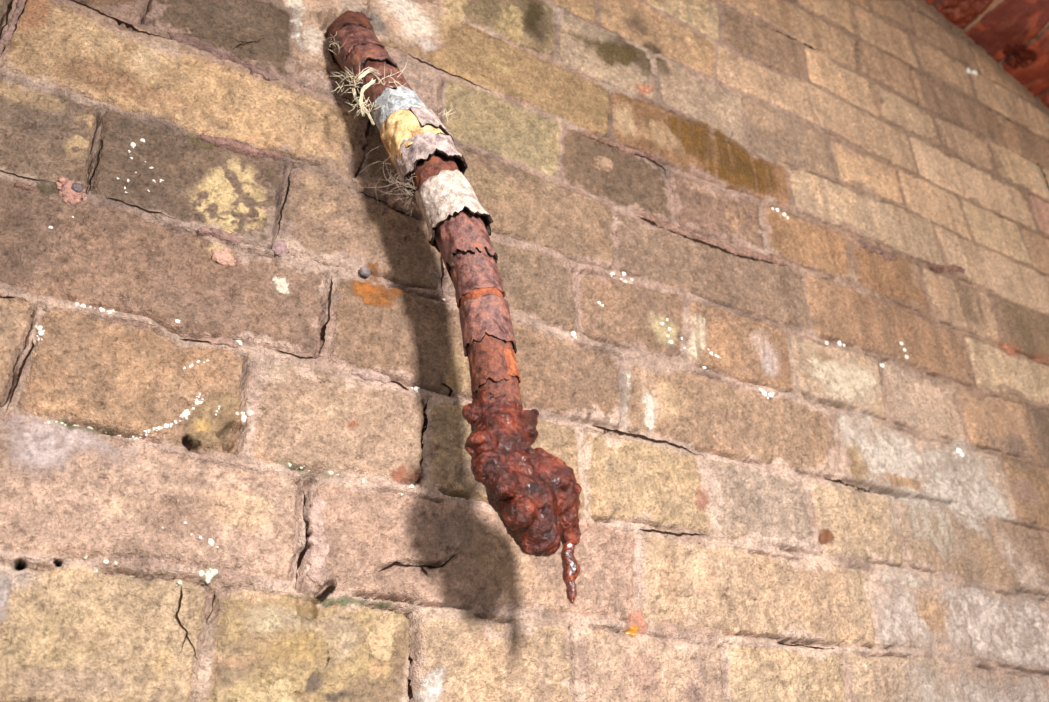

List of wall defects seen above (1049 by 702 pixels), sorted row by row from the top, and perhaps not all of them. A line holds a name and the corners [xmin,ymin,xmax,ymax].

crack [0,0,28,53]
crack [73,0,174,40]
rust [353,263,404,306]
crack [277,279,333,358]
crack [378,553,457,575]
crack [175,586,215,658]
rust [625,610,648,637]